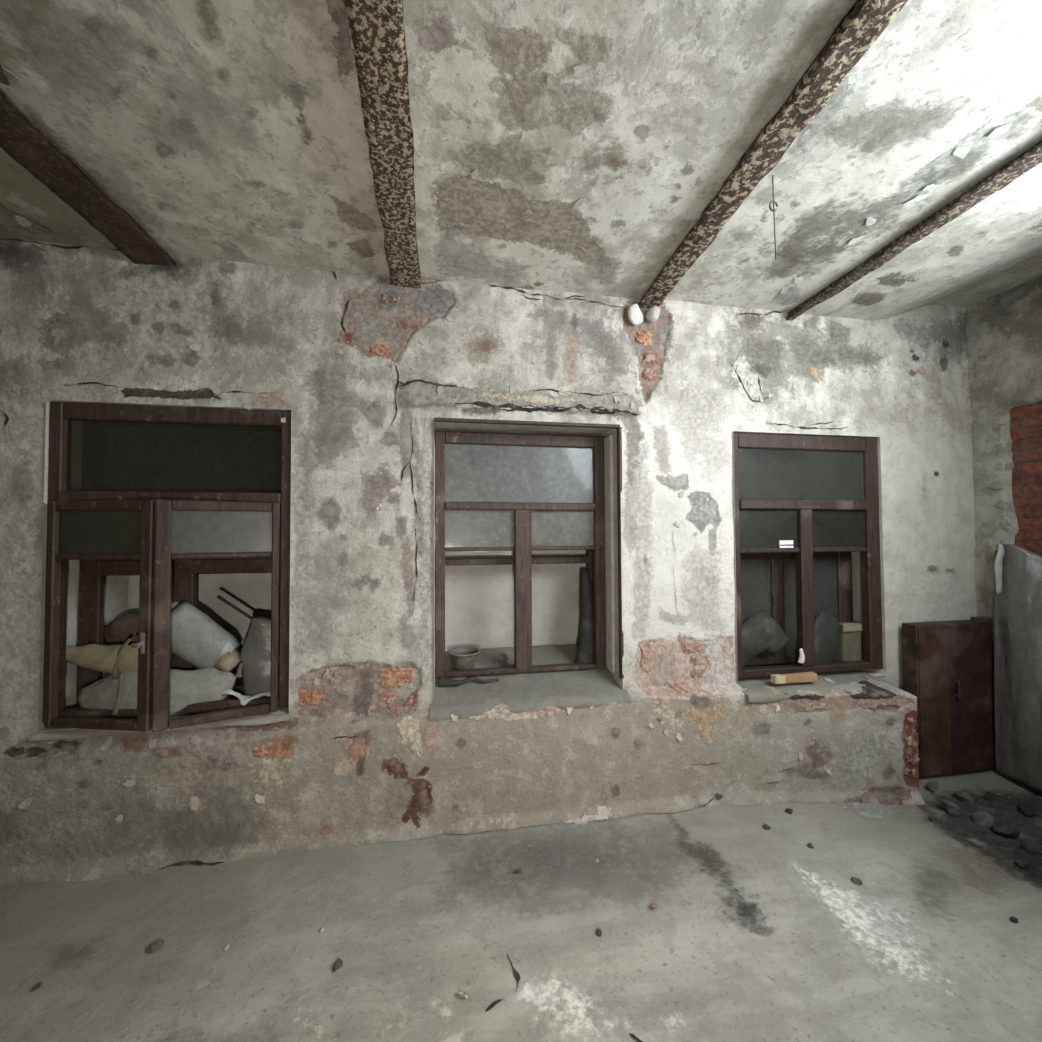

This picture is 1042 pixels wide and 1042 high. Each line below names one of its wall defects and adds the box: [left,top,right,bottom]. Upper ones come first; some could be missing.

spalling [336,275,456,367]
spalling [392,299,675,421]
peeling [317,463,407,550]
crack [391,359,421,611]
peeling [656,473,722,557]
flaking render [989,401,1042,556]
spalling [0,728,82,769]
spalling [93,660,442,811]
corrosion [333,730,373,776]
corrosion [381,758,433,828]
peeling [451,706,573,721]
spalling [635,635,736,741]